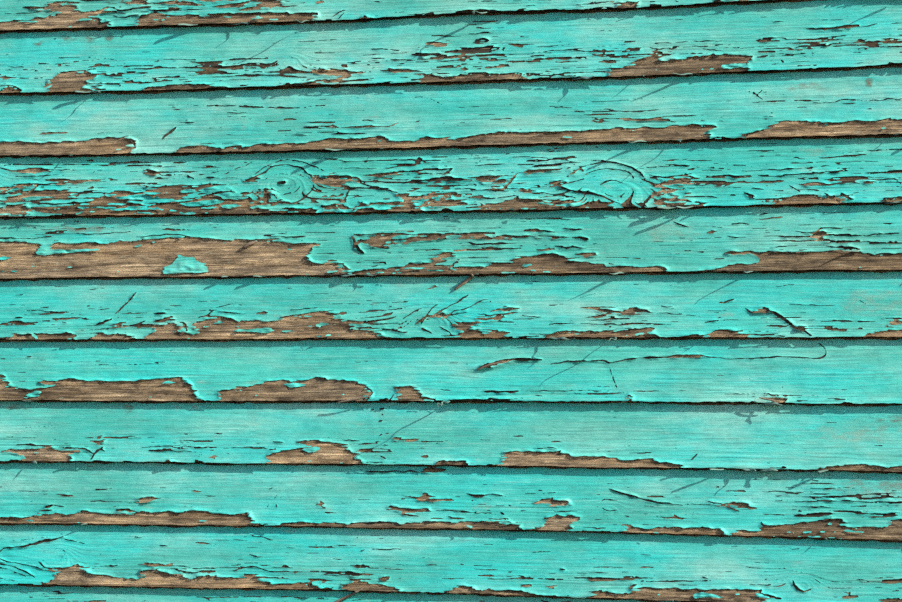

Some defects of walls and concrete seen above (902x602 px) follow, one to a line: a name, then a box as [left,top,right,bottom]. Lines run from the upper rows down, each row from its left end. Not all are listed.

peeling [176,116,717,153]
peeling [738,118,902,138]
peeling [0,165,617,217]
peeling [0,228,667,290]
peeling [699,229,902,272]
peeling [89,310,392,339]
peeling [0,374,207,401]
peeling [217,377,373,403]
peeling [491,448,683,468]
peeling [0,496,260,526]
peeling [622,515,902,540]
peeling [41,562,328,589]